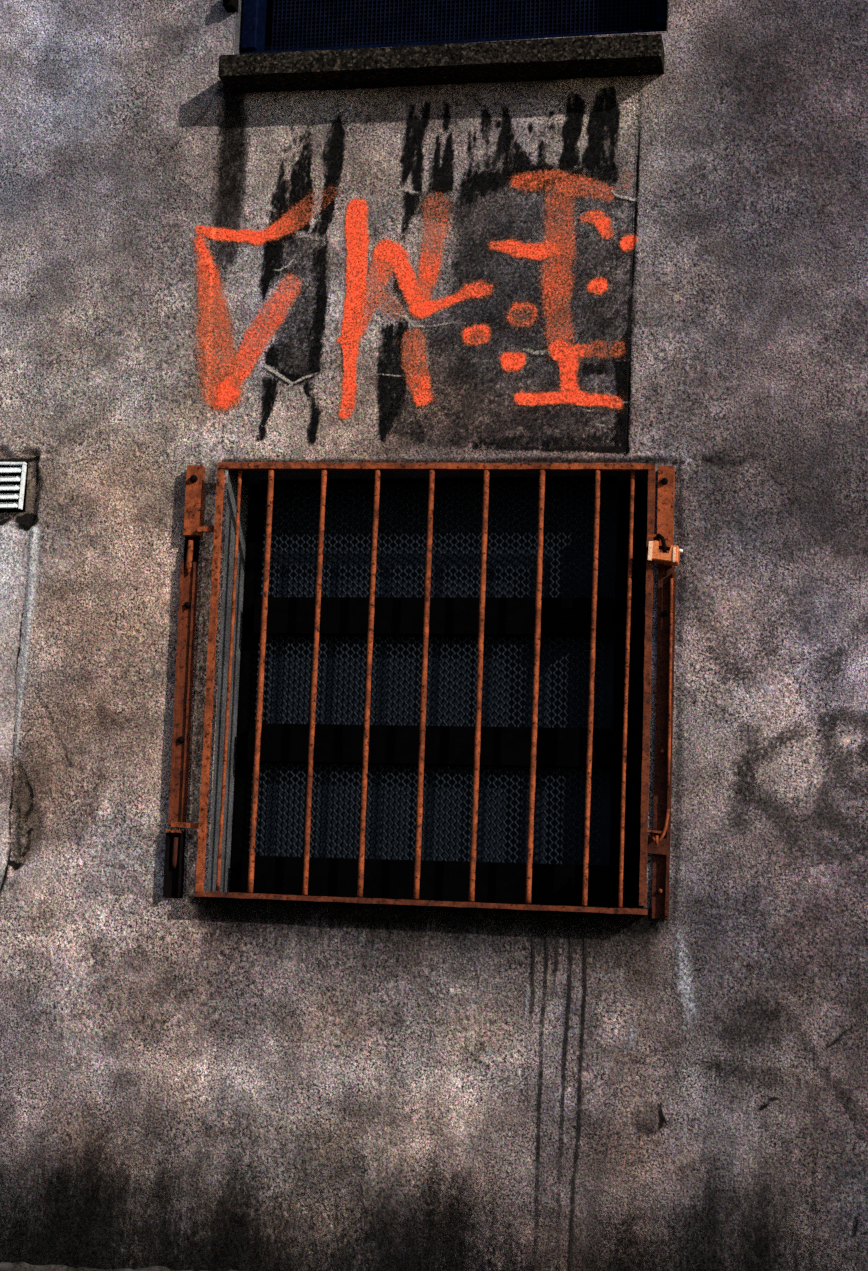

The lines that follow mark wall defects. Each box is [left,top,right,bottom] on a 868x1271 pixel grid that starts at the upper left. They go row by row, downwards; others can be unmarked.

crack [0,605,74,893]
damp [184,456,682,1271]
damp [675,928,697,1030]
damp [0,1149,467,1271]
damp [674,1196,797,1271]